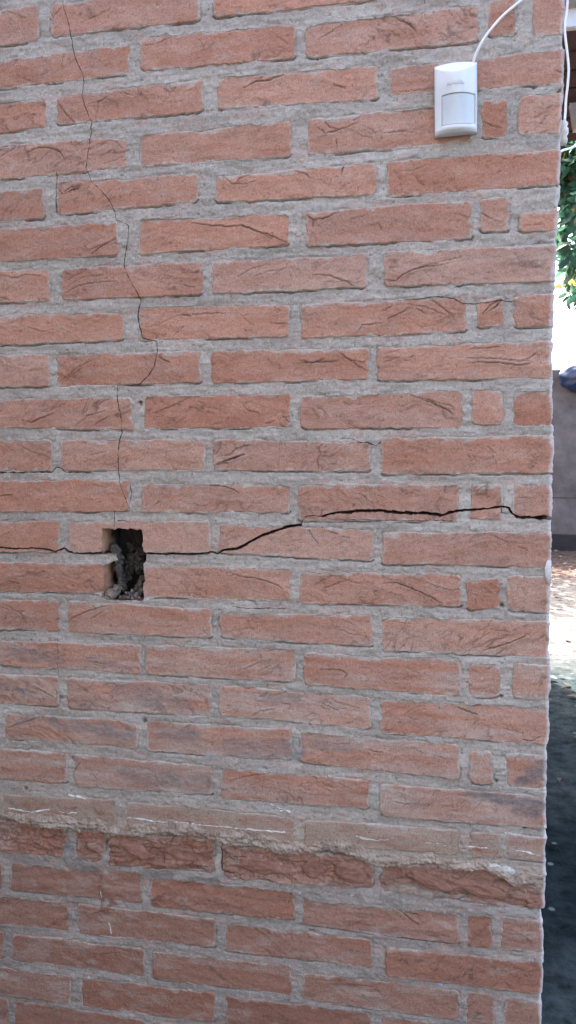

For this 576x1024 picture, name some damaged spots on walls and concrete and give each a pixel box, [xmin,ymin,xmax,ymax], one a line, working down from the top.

crack [56,2,158,522]
crack [0,546,110,554]
crack [142,506,550,556]
spalling [0,811,546,909]